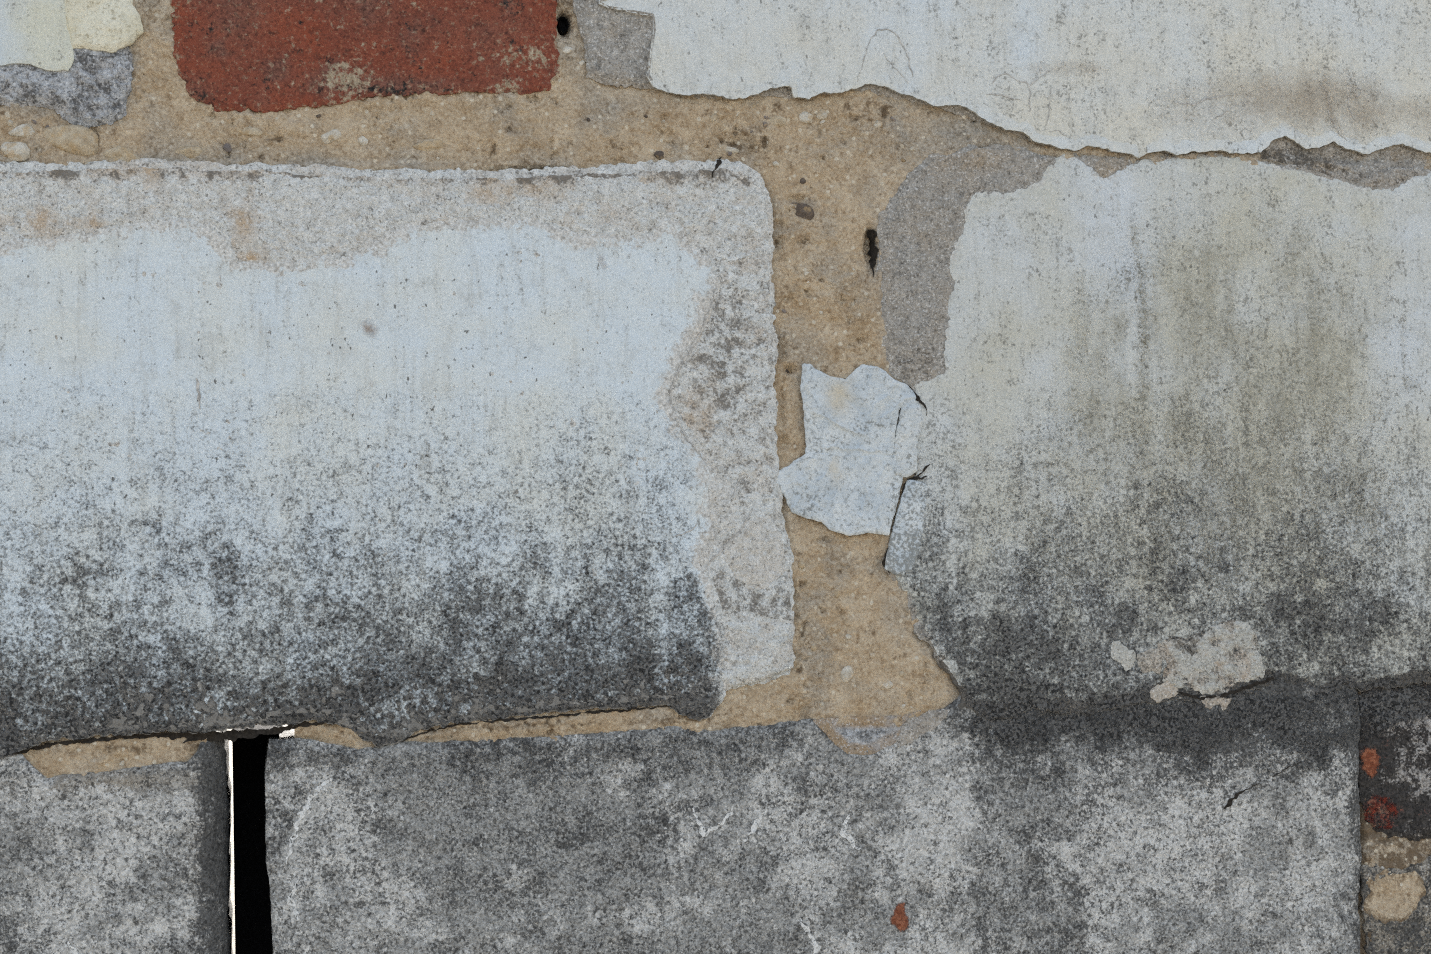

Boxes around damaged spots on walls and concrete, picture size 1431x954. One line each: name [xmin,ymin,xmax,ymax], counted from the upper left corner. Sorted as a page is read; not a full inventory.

flaking render [0,0,1431,691]
mould [0,417,789,795]
damp [900,444,1431,791]
flaking render [1110,619,1266,710]